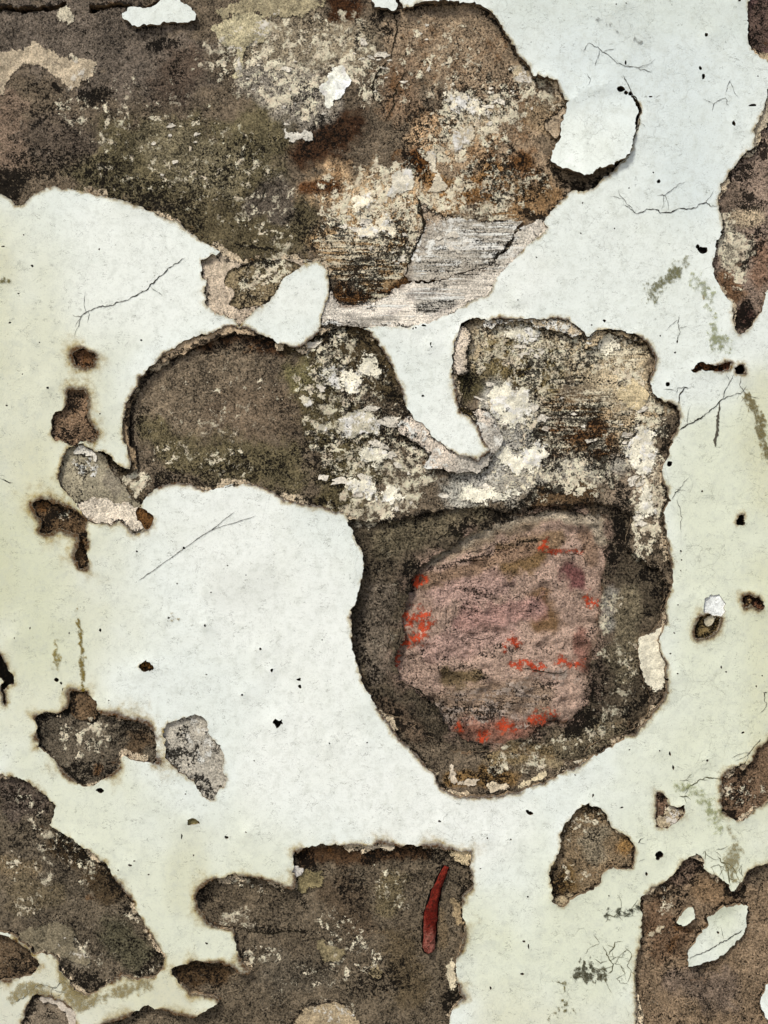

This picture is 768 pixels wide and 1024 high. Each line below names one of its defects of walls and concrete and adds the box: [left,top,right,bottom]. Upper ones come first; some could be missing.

crack [73,259,182,332]
flaking render [0,0,682,800]
crack [610,183,713,214]
crack [669,374,756,430]
flaking render [696,89,768,335]
flaking render [0,773,474,1024]
flaking render [549,791,768,1024]